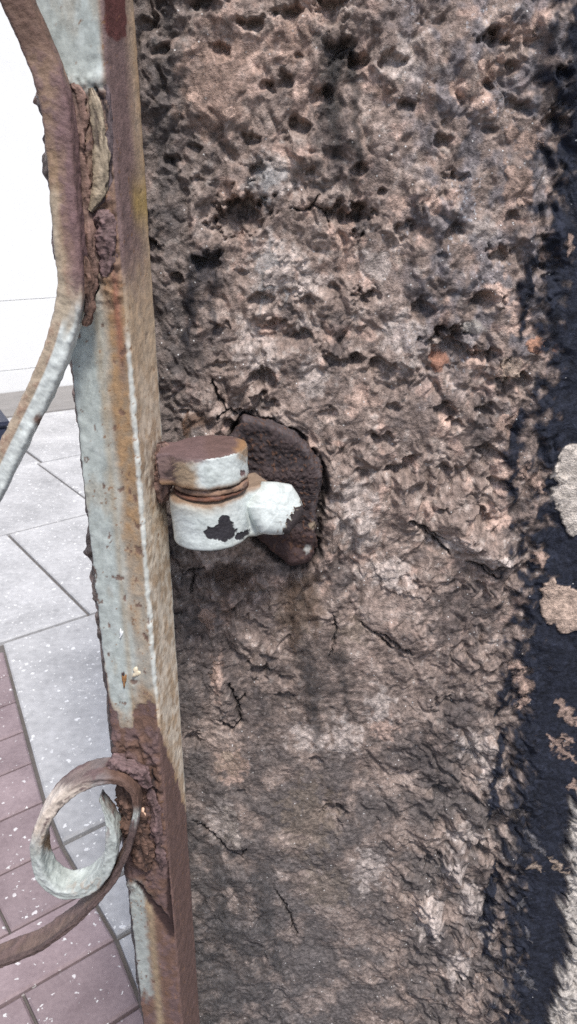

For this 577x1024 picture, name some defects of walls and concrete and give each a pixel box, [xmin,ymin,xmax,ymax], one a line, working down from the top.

corrosion [82,84,123,327]
corrosion [114,785,168,872]